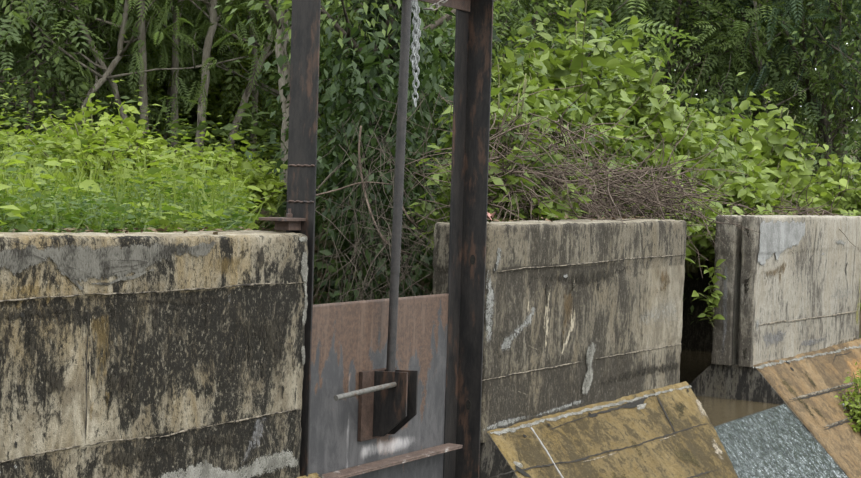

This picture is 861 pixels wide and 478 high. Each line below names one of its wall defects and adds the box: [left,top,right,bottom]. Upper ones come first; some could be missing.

leakage [254,246,268,274]
flaking render [758,220,805,265]
leakage [0,304,77,378]
leakage [484,248,501,341]
leakage [501,301,534,352]
leakage [529,266,628,351]
leakage [39,369,71,398]
leakage [601,363,679,384]
leakage [241,417,265,462]